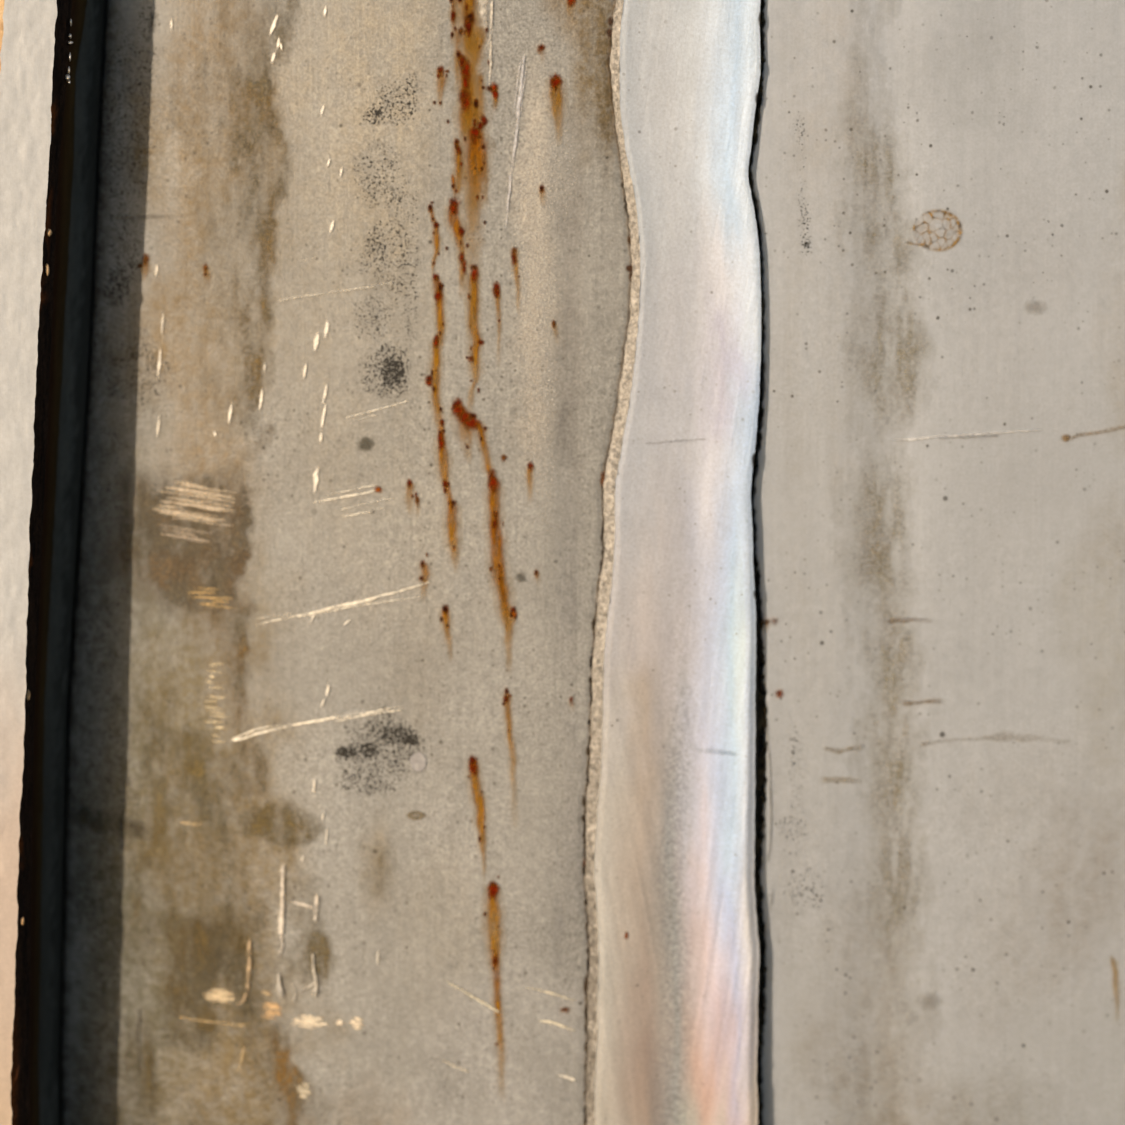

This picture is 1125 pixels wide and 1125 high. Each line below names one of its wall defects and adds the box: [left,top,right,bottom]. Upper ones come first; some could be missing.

water stain [897,211,961,258]
rust [511,248,519,284]
rust [426,0,516,636]
rust [419,553,428,583]
rust [502,688,511,746]
rust [468,756,486,852]
rust [483,876,502,1048]